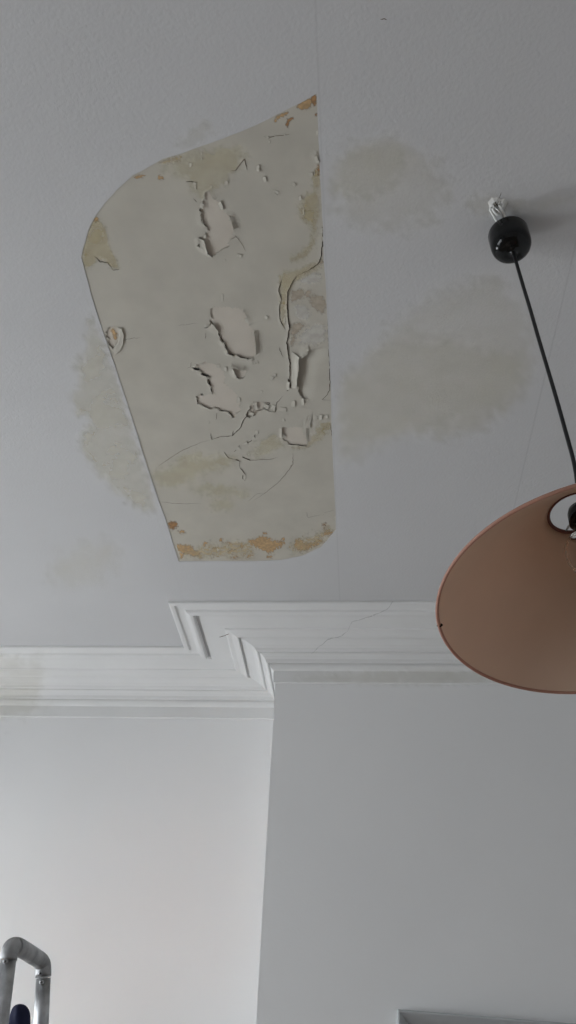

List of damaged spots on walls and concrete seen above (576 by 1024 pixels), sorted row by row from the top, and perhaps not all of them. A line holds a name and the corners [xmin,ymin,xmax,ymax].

peeling [81,94,336,561]
crack [159,227,323,500]